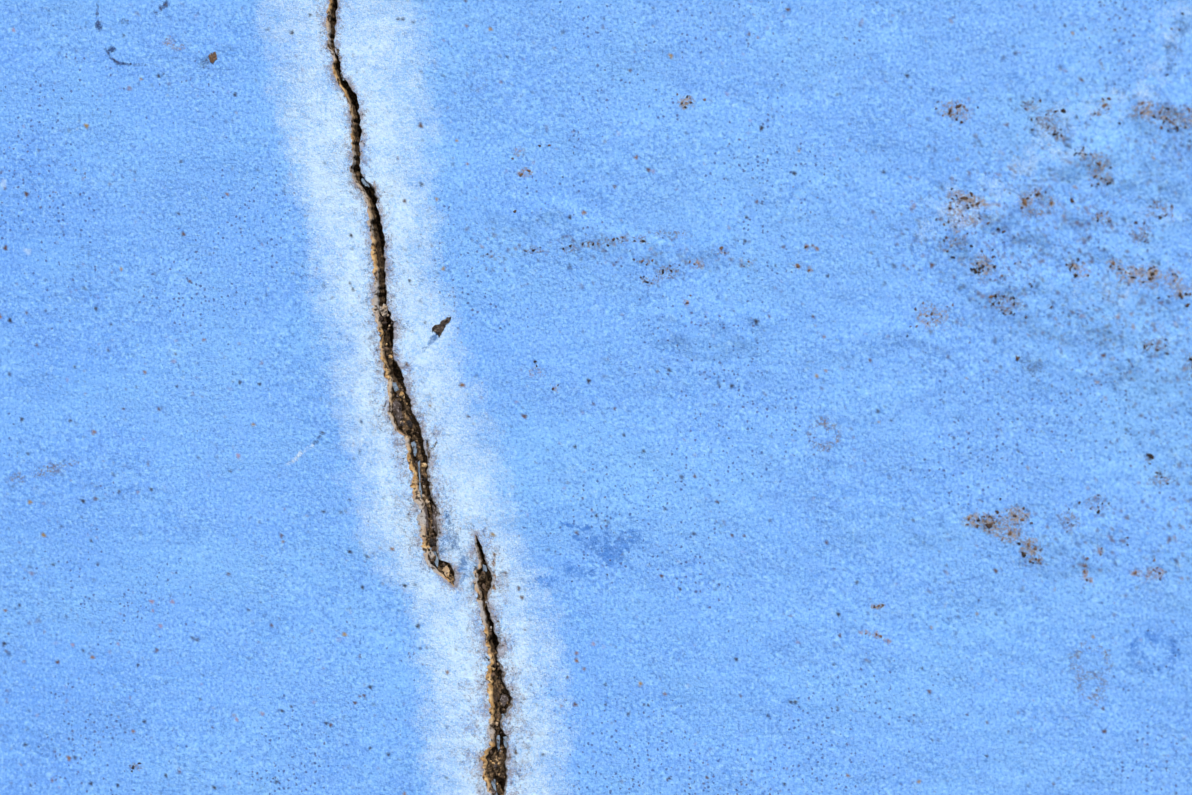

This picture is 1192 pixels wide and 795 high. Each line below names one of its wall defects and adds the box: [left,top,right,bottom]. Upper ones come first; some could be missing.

water stain [248,0,587,795]
crack [309,0,543,795]